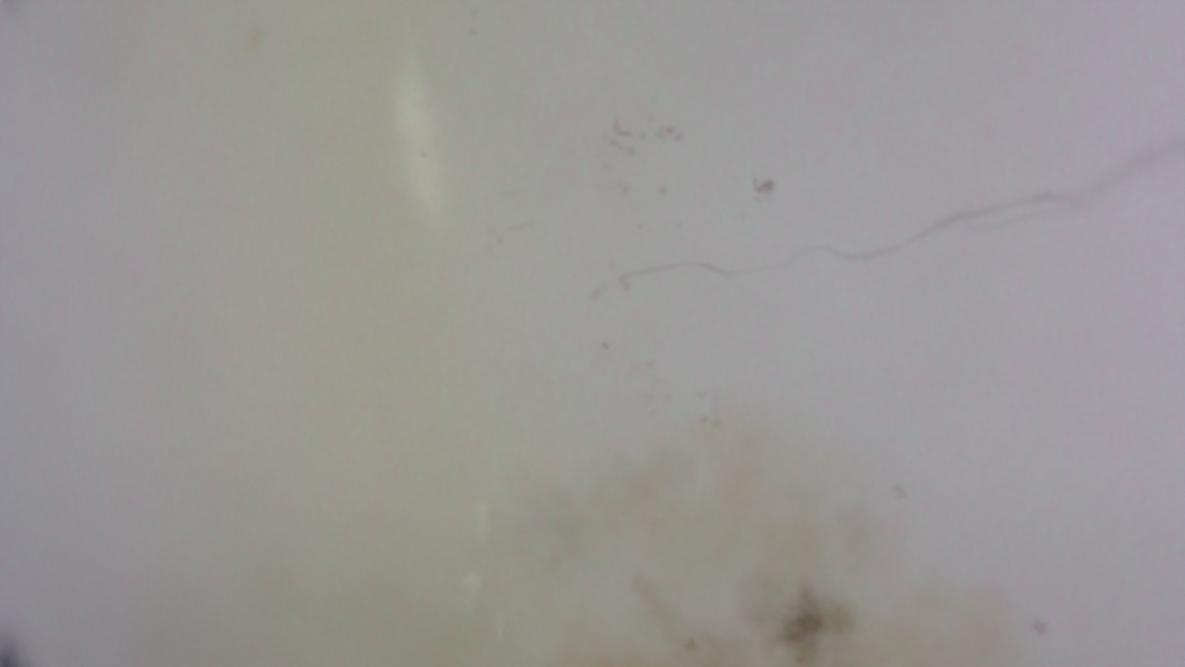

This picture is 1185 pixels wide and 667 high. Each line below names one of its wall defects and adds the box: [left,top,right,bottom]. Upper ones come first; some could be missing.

damp [391,346,1185,667]